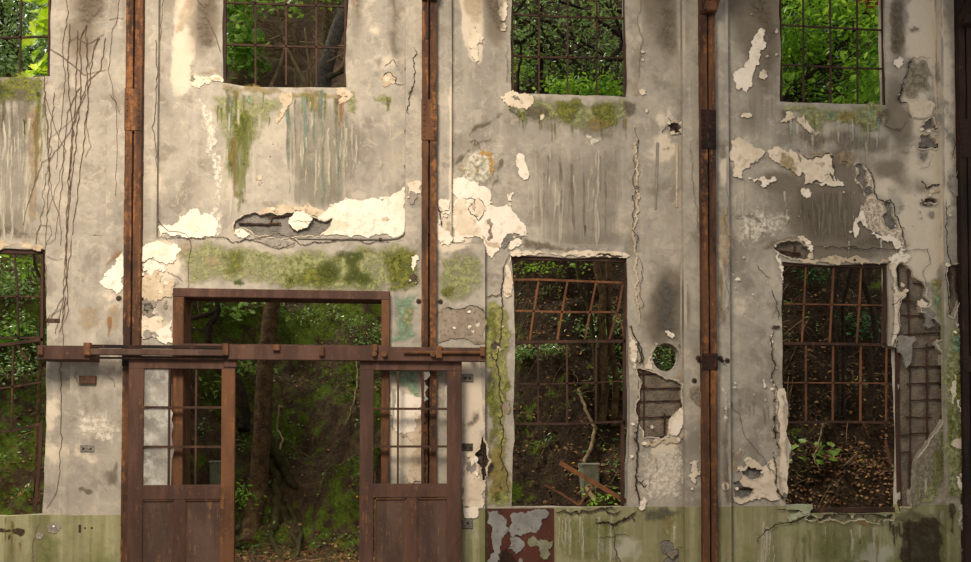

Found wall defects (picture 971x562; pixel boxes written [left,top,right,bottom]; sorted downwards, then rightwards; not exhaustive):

peeling [142,209,218,344]
damp [199,89,355,236]
peeling [232,180,421,240]
peeling [436,175,630,298]
damp [524,239,569,249]
crack [596,127,644,366]
spalling [629,337,683,447]
crack [757,266,809,562]
spalling [773,162,961,508]
corrosion [500,548,516,562]
crack [556,421,647,562]
damp [889,485,962,562]